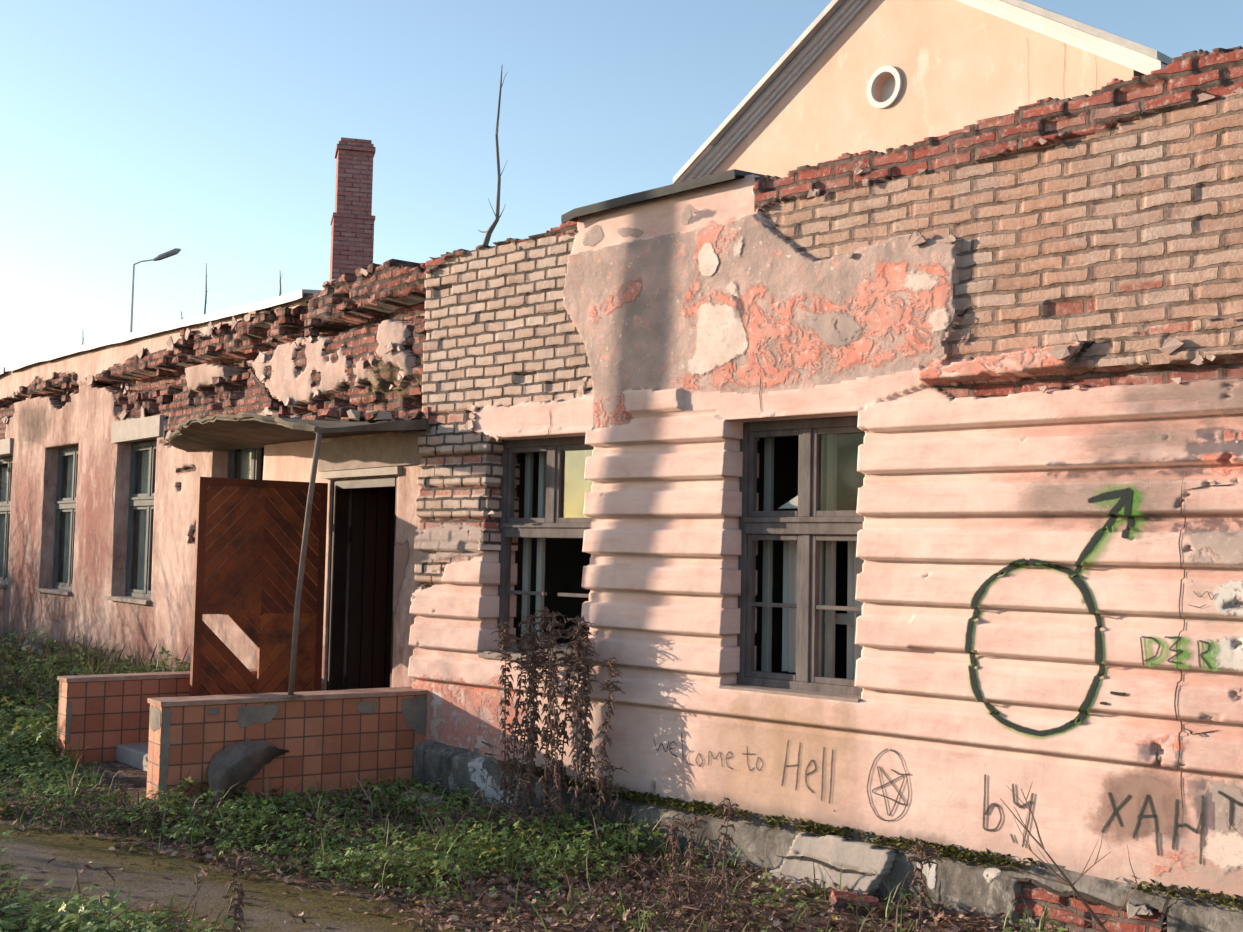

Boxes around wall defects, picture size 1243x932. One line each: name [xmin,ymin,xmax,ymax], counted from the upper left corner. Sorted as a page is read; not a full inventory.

flaking render [0,391,18,440]
flaking render [84,93,1243,618]
crack [1174,470,1243,831]
peeling [401,675,527,810]
damp [1093,769,1186,839]
spalling [1015,882,1167,932]